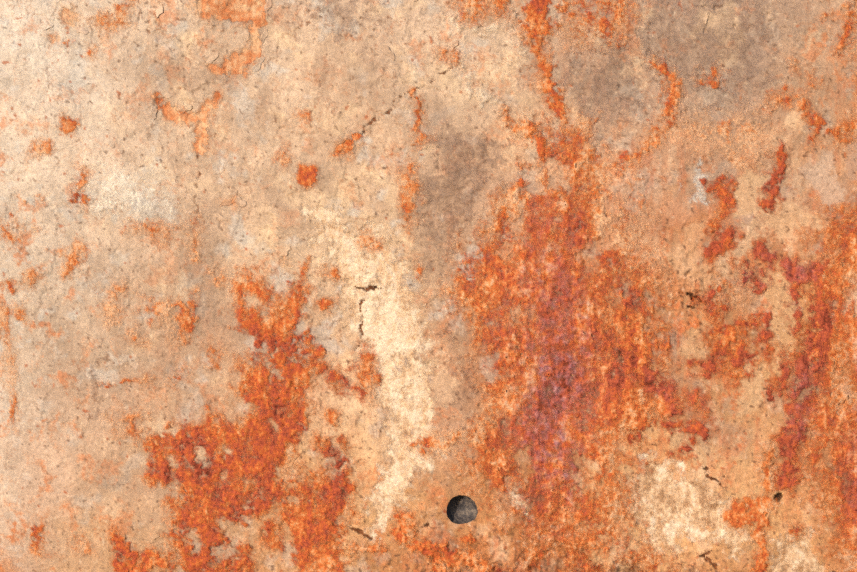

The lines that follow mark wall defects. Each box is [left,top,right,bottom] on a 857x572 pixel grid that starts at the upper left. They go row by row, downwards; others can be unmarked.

rust [102,0,787,572]
rust [687,174,857,572]
rust [765,85,857,148]
rust [832,0,857,57]